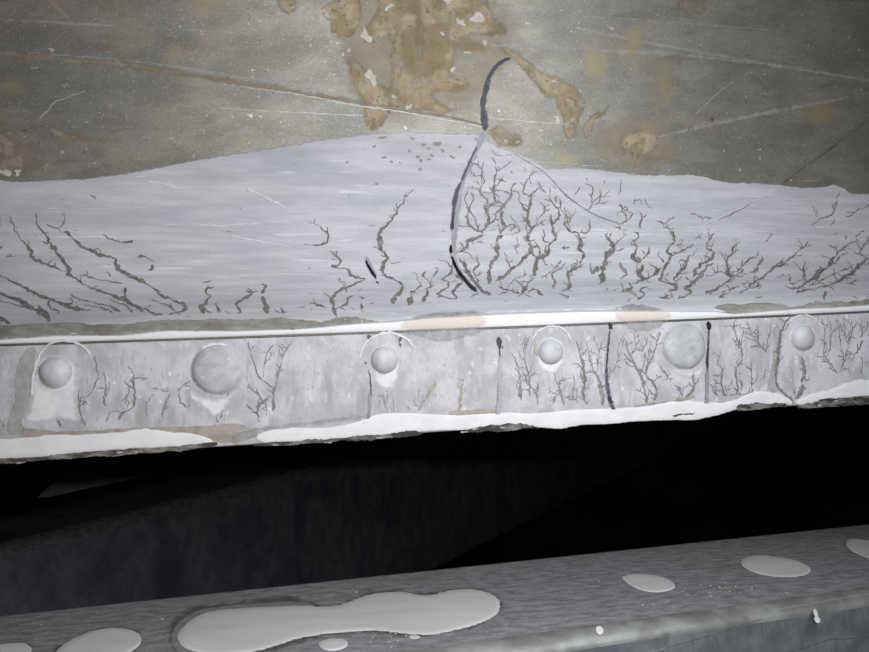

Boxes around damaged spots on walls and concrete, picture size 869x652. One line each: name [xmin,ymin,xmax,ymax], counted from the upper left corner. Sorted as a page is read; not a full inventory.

water stain [0,134,26,177]
peeling [409,137,461,170]
crack [0,212,284,325]
crack [305,157,869,412]
crack [57,357,191,427]
crack [216,342,292,423]
water stain [170,599,323,640]